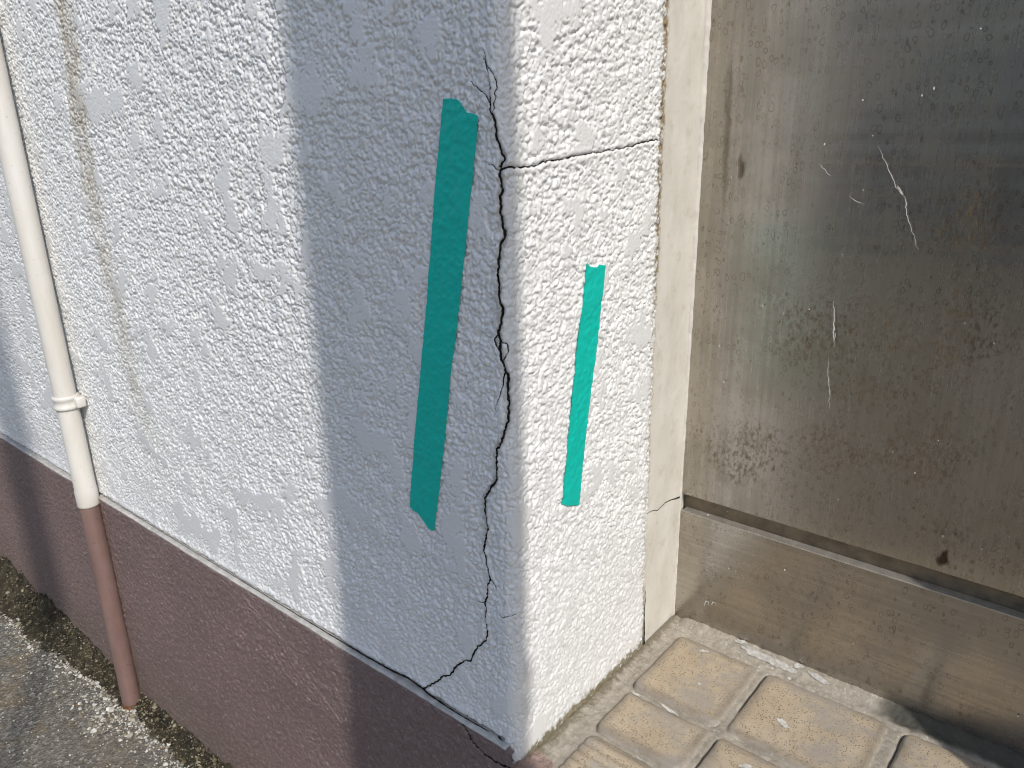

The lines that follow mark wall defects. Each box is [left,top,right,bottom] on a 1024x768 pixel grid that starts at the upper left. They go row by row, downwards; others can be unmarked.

crack [101,52,658,768]